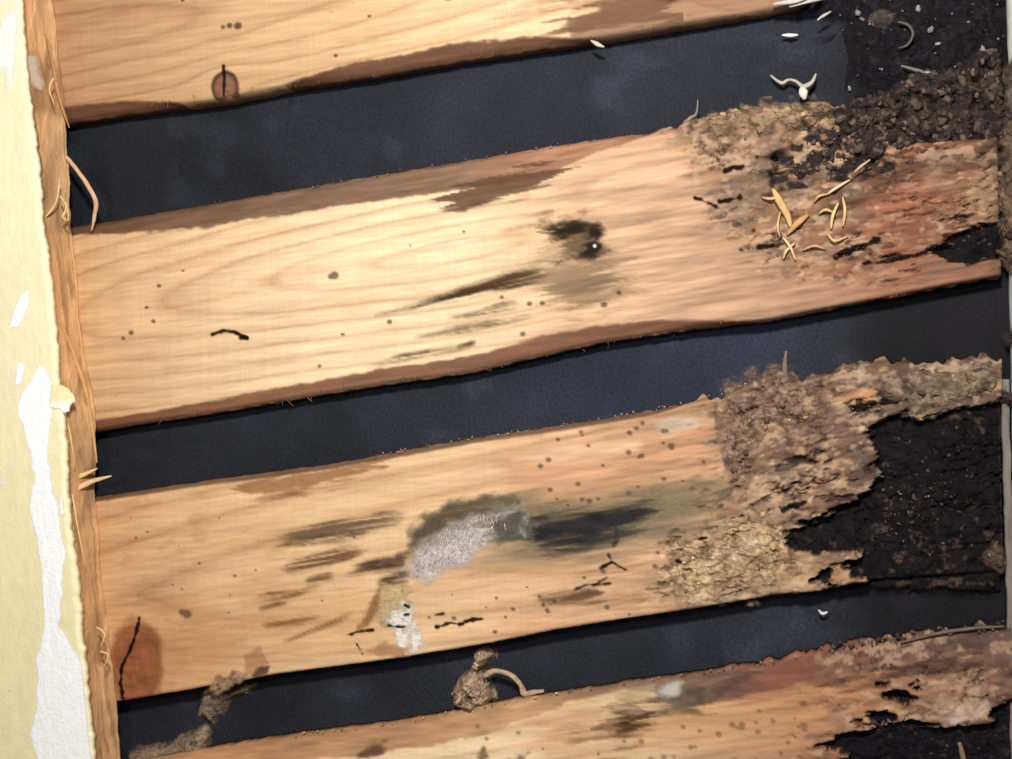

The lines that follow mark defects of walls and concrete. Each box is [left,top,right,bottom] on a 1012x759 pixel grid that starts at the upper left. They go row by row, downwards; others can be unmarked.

spalling [771,108,895,190]
leakage [547,220,610,263]
spalling [929,223,1002,265]
leakage [417,270,533,306]
spalling [785,400,1001,590]
peeling [15,361,91,759]
crack [119,617,140,699]
leakage [263,591,303,608]
leakage [269,617,341,633]
leakage [283,487,712,653]
spalling [816,683,1011,759]